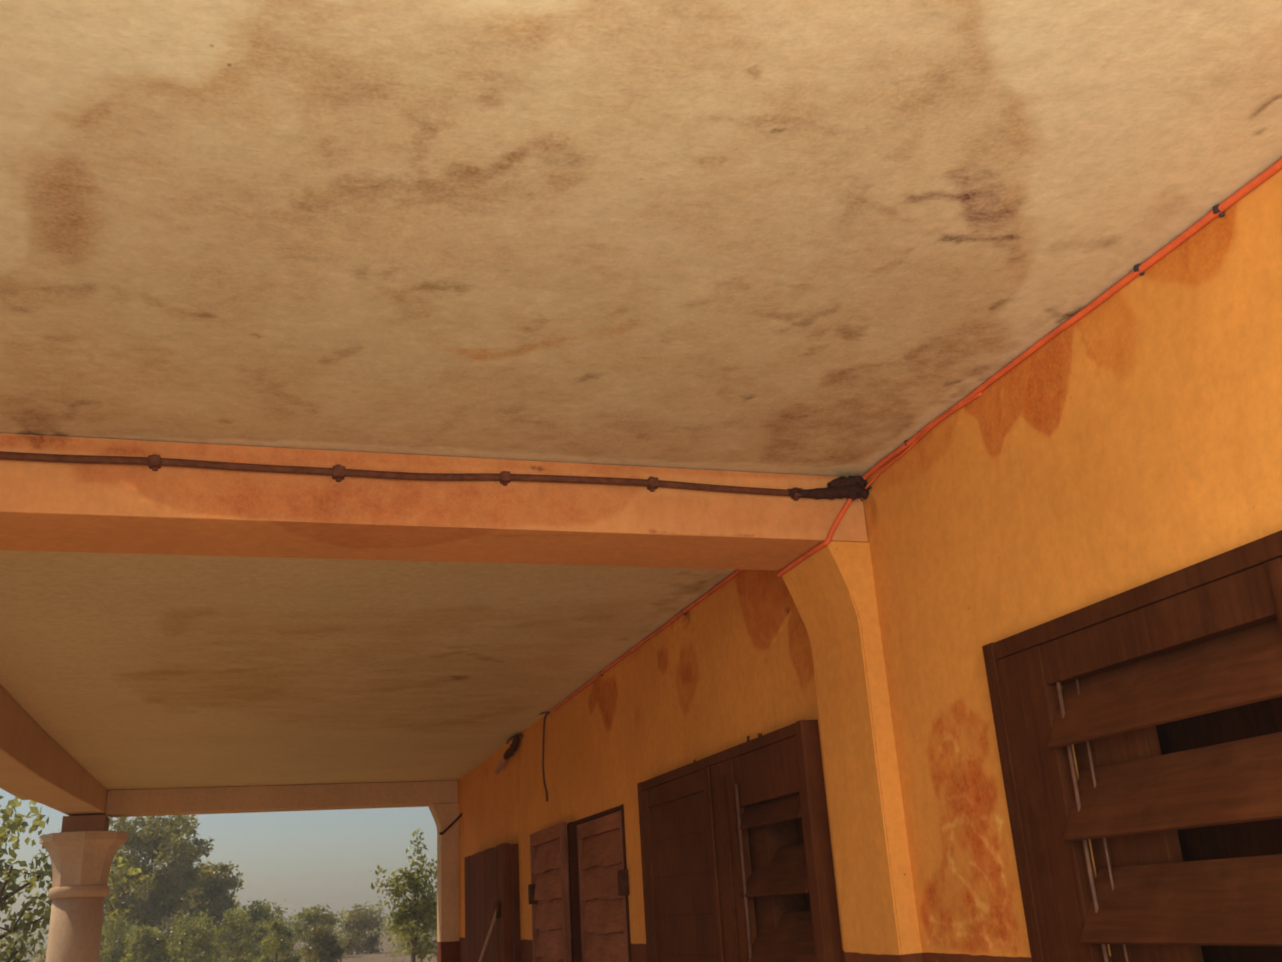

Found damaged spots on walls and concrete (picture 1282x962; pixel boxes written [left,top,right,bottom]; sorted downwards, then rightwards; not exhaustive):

damp [0,0,1200,551]
damp [1139,197,1245,296]
damp [102,570,815,738]